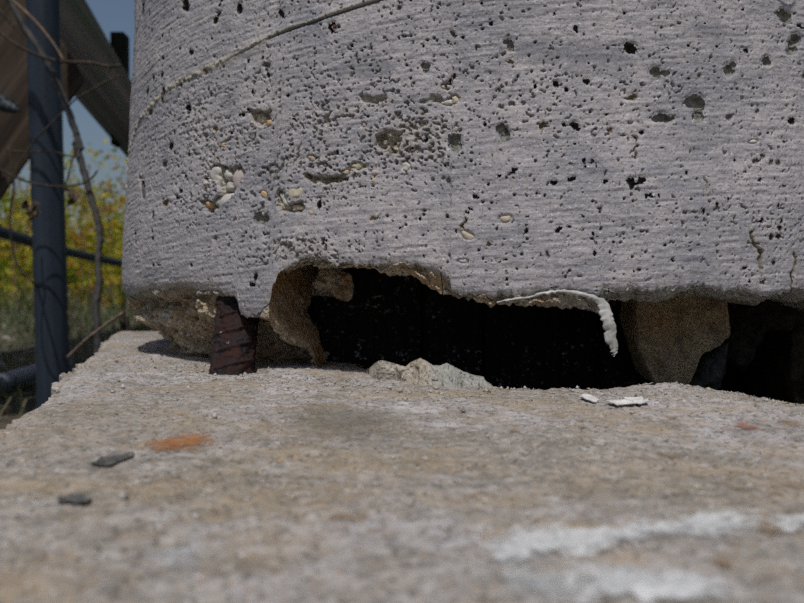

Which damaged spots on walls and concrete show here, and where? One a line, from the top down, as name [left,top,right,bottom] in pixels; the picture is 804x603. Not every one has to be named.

spalling [126,286,235,358]
spalling [250,257,804,367]
peeling [579,393,599,403]
peeling [622,396,649,404]